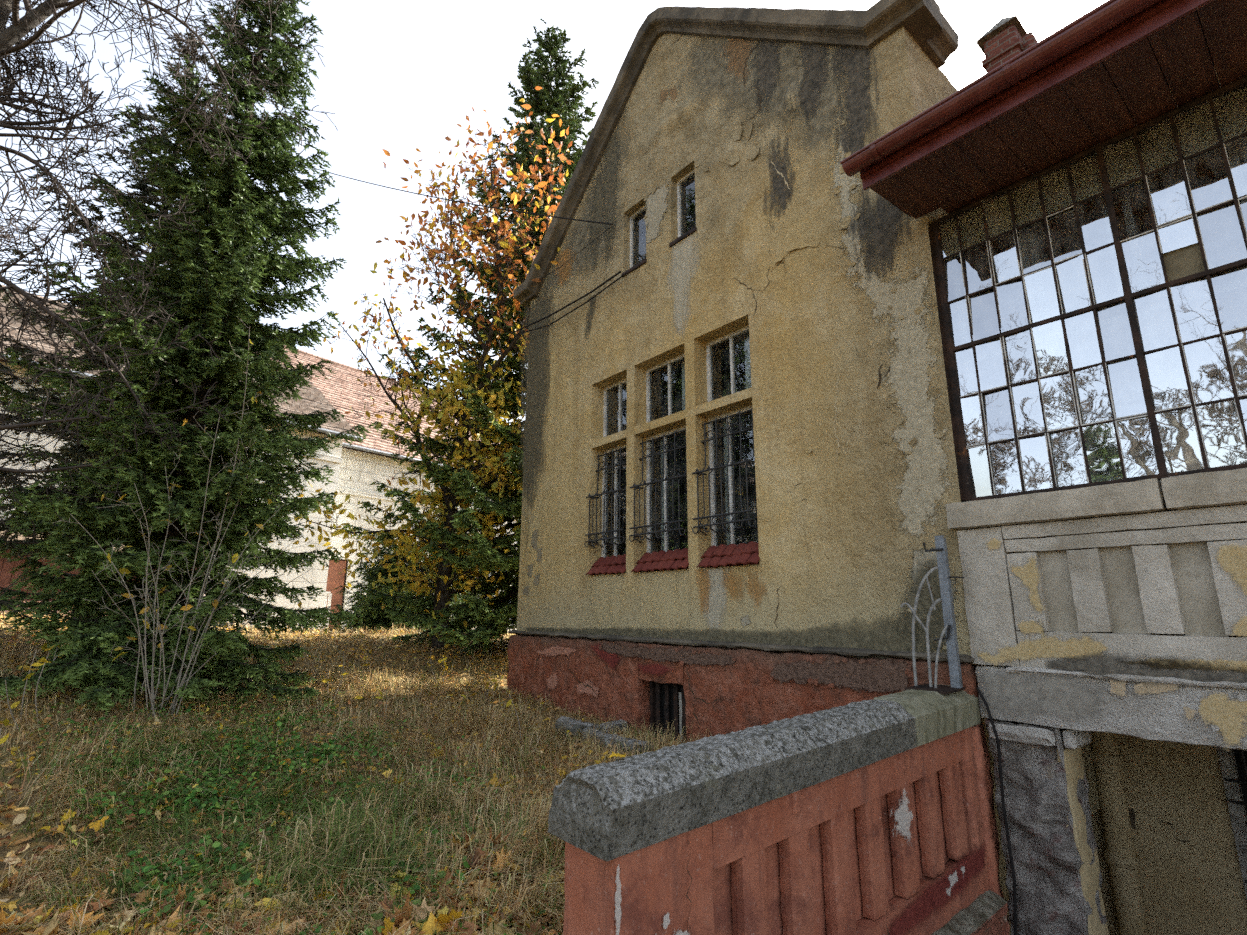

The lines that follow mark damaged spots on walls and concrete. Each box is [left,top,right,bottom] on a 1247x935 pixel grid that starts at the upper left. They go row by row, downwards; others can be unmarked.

leakage [754,41,780,108]
leakage [799,43,879,155]
leakage [764,138,795,212]
leakage [851,191,910,278]
crack [733,258,787,317]
peeling [689,38,958,613]
leakage [527,564,946,668]
peeling [978,557,1107,666]
flaking render [770,656,914,693]
peeling [1183,693,1247,745]
peeling [891,789,913,845]
peeling [663,912,689,935]